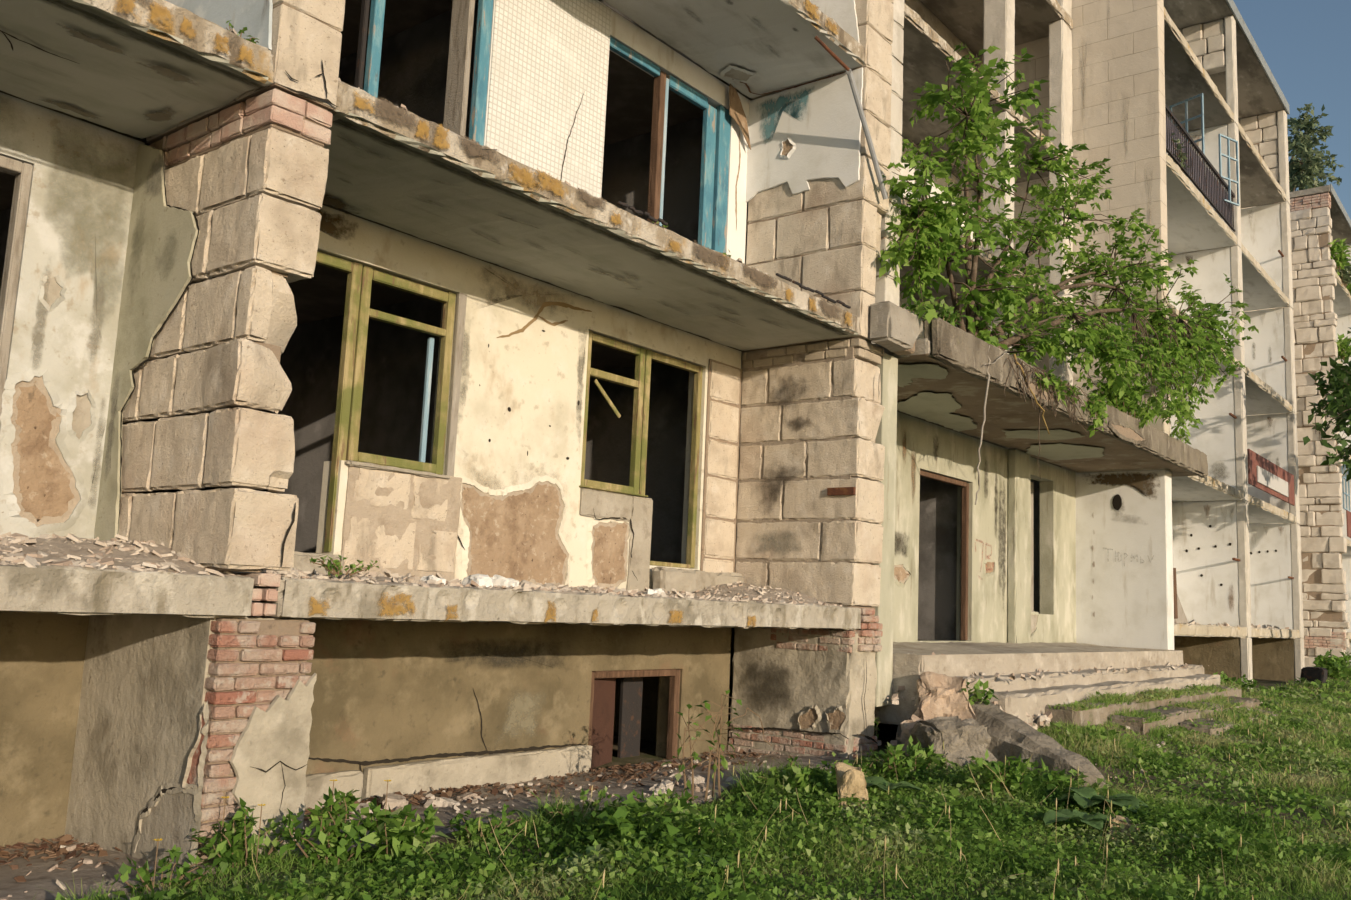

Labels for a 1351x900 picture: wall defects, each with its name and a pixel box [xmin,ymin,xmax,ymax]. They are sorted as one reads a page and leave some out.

crack [560,91,585,181]
peeling [746,67,863,203]
crack [118,150,199,530]
crack [497,302,592,338]
peeling [897,364,977,432]
spalling [1018,377,1059,408]
peeling [1001,429,1105,460]
spalling [1108,420,1147,445]
spalling [459,475,631,589]
flaking render [131,620,317,868]